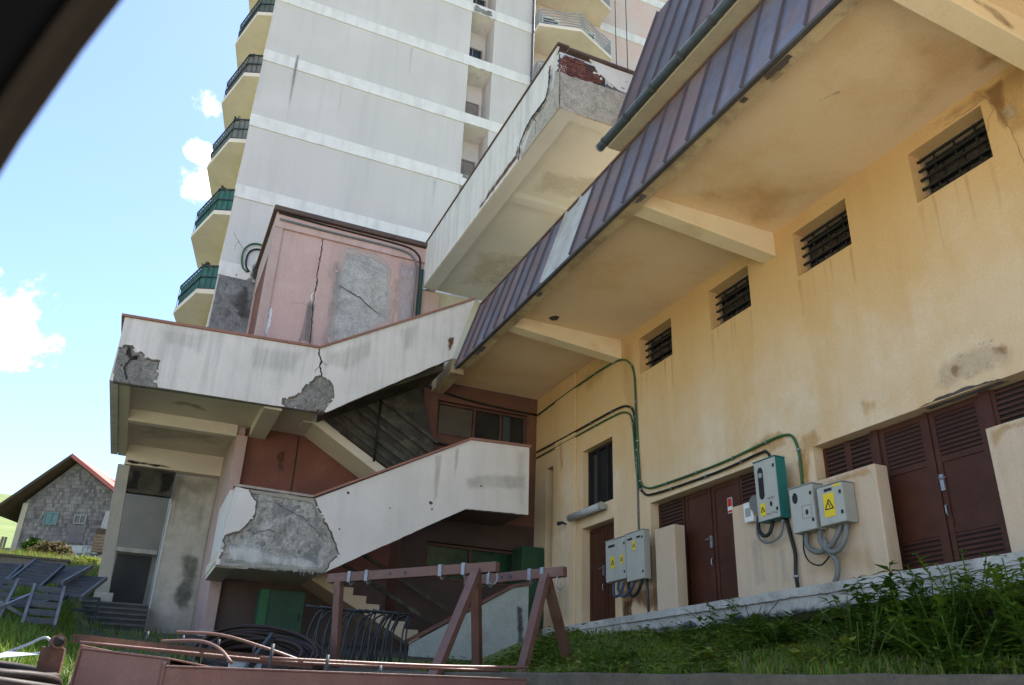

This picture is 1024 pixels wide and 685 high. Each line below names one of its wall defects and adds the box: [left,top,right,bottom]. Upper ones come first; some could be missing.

crack [518,65,551,159]
spalling [557,54,627,94]
crack [297,239,326,375]
peeling [327,247,393,343]
spalling [113,345,159,388]
spalling [283,376,334,416]
spalling [217,489,341,576]
water stain [175,557,197,607]